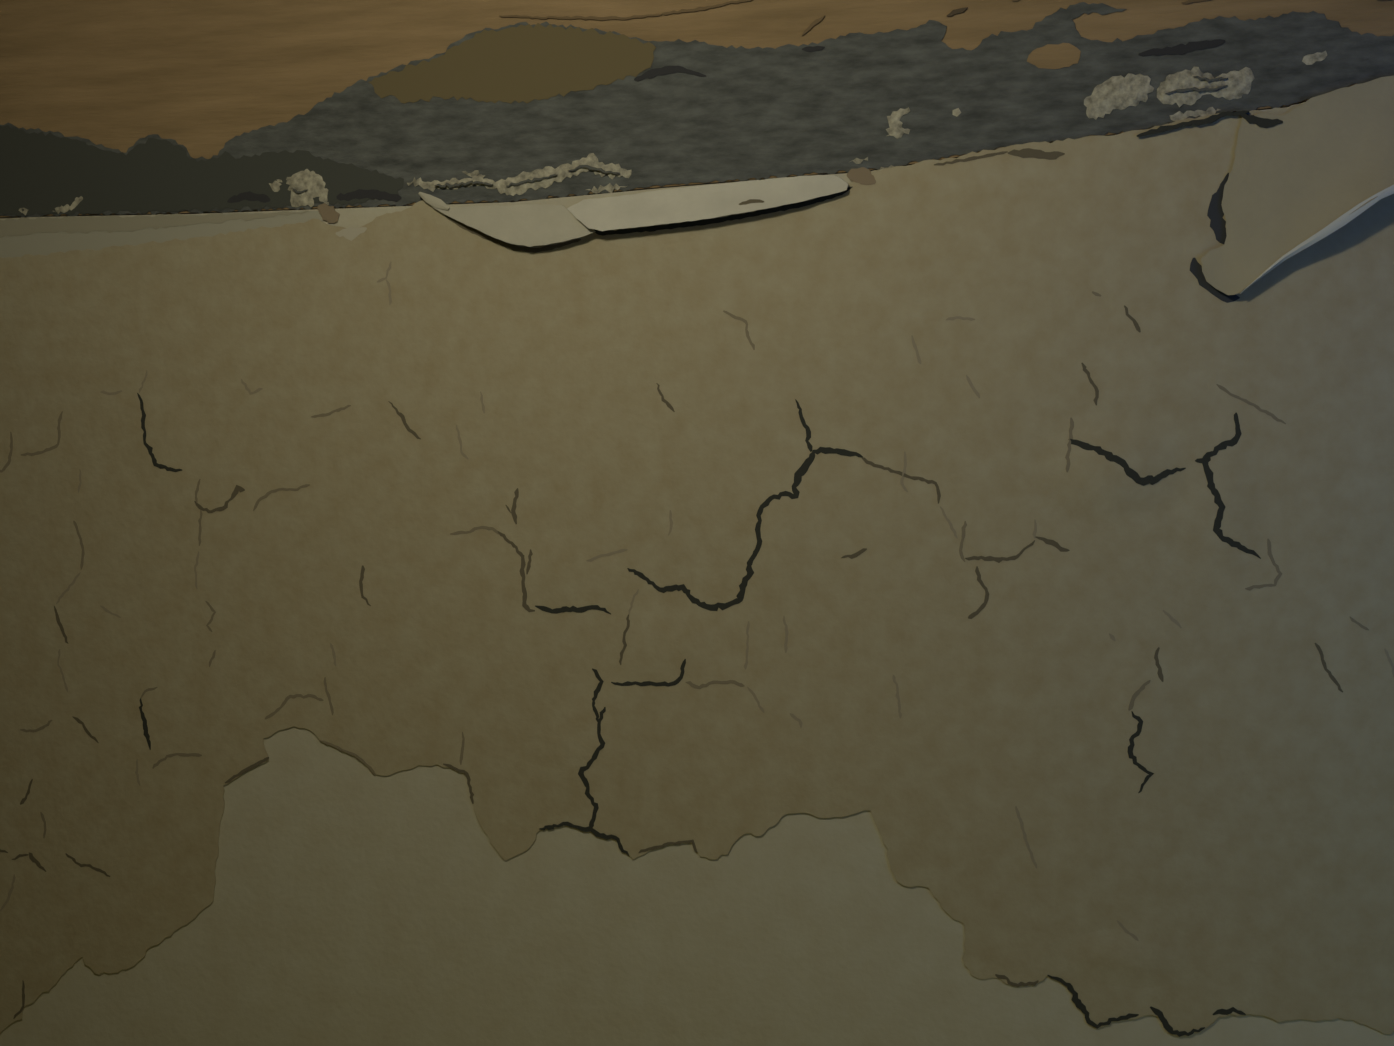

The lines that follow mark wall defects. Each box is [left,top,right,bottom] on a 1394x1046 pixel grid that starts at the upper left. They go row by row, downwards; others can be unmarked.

peeling [1027,43,1081,69]
spalling [1165,76,1228,94]
peeling [0,211,323,258]
crack [100,370,310,667]
crack [1065,363,1286,591]
crack [135,687,202,786]
crack [443,732,474,804]
crack [450,391,1070,856]
crack [1127,610,1182,793]
crack [1315,643,1343,693]
crack [0,779,110,877]
crack [995,974,1246,1037]